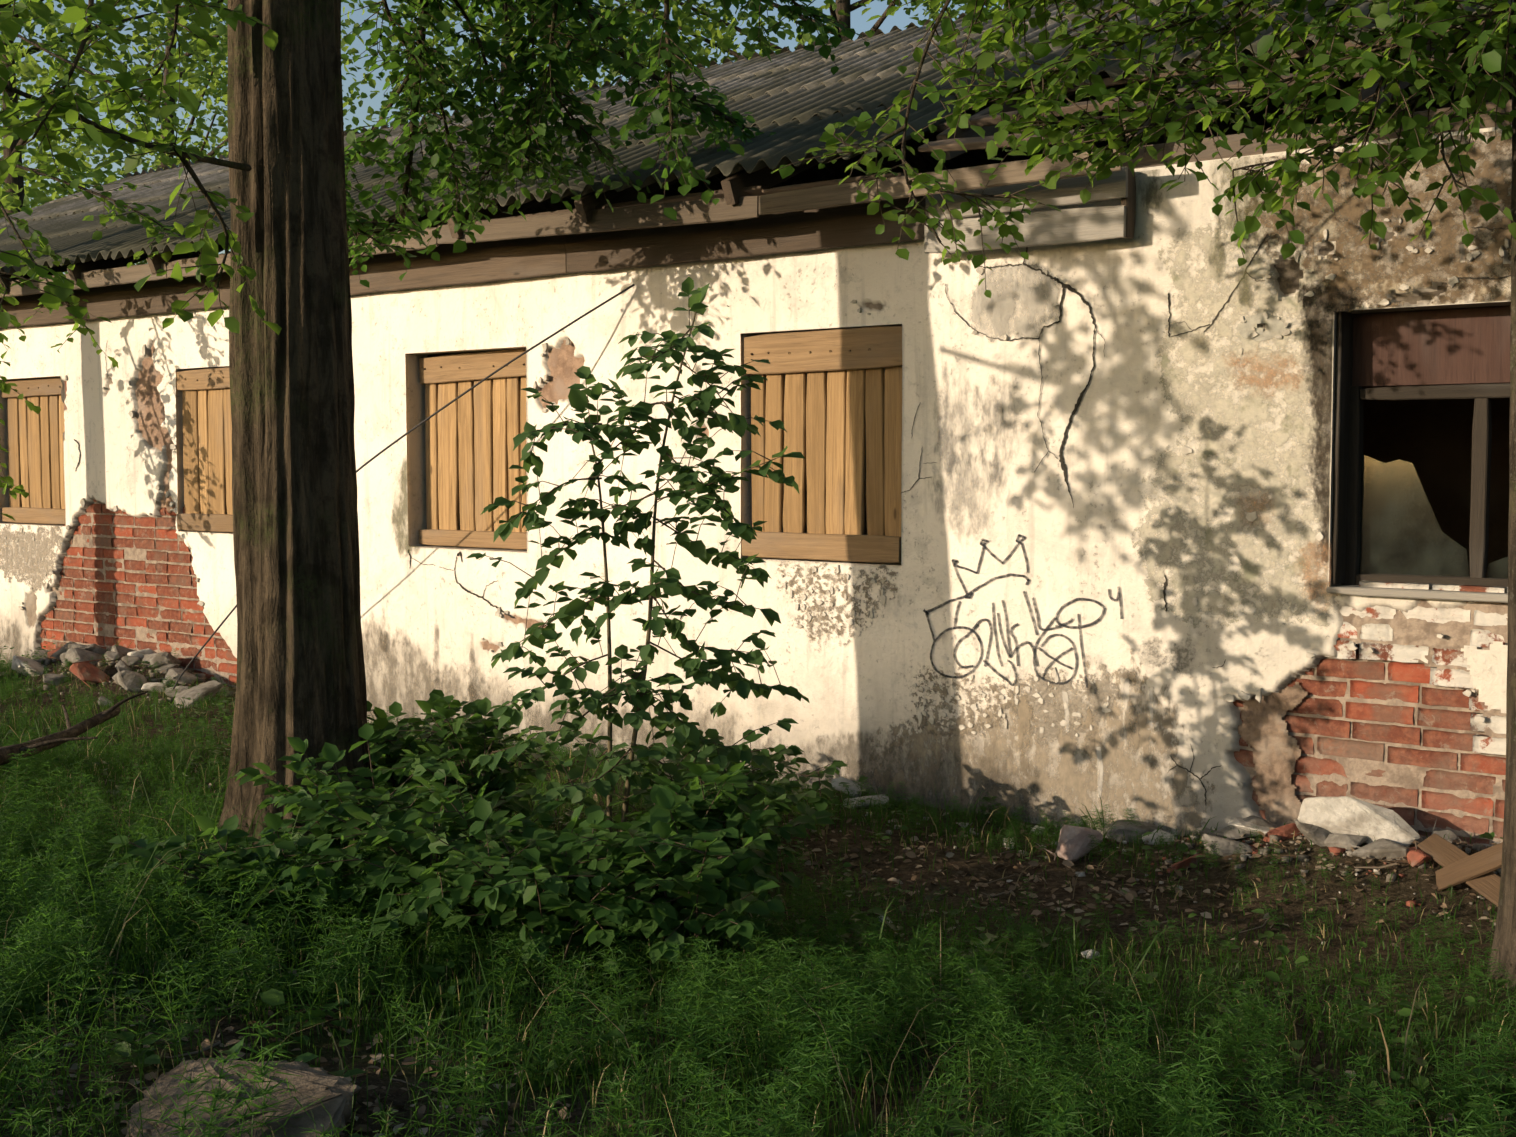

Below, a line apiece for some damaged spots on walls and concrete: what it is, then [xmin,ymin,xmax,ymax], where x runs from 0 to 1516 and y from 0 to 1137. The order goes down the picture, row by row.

flaking render [0,343,237,689]
flaking render [533,338,585,413]
leakage [938,403,1000,527]
crack [945,247,1106,508]
peeling [1133,182,1508,867]
leakage [787,649,1214,836]